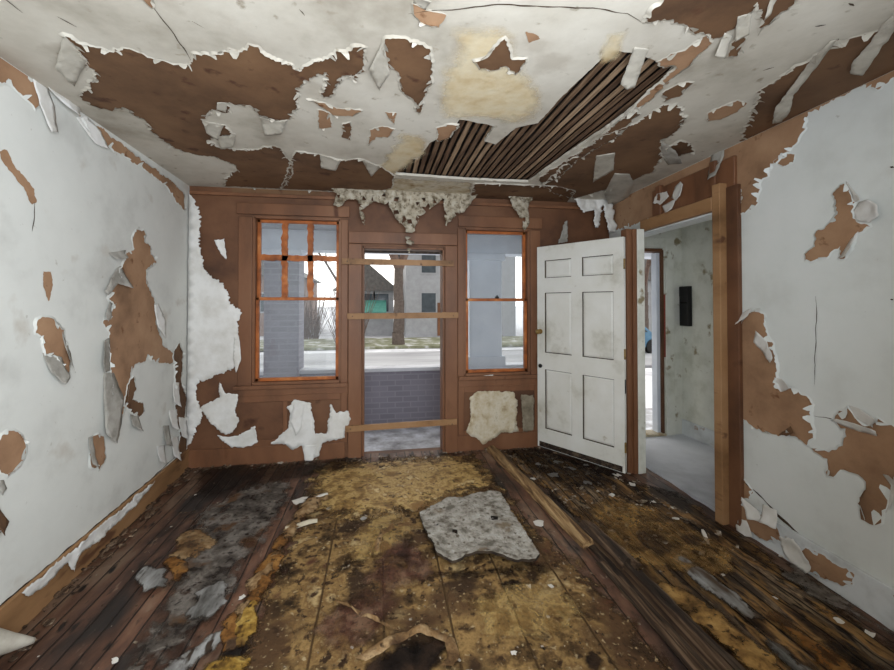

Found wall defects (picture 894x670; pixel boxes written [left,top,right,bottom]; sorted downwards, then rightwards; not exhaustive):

peeling [0,0,894,471]
peeling [0,428,30,495]
peeling [735,308,894,527]
peeling [0,506,9,535]
peeling [736,479,857,588]